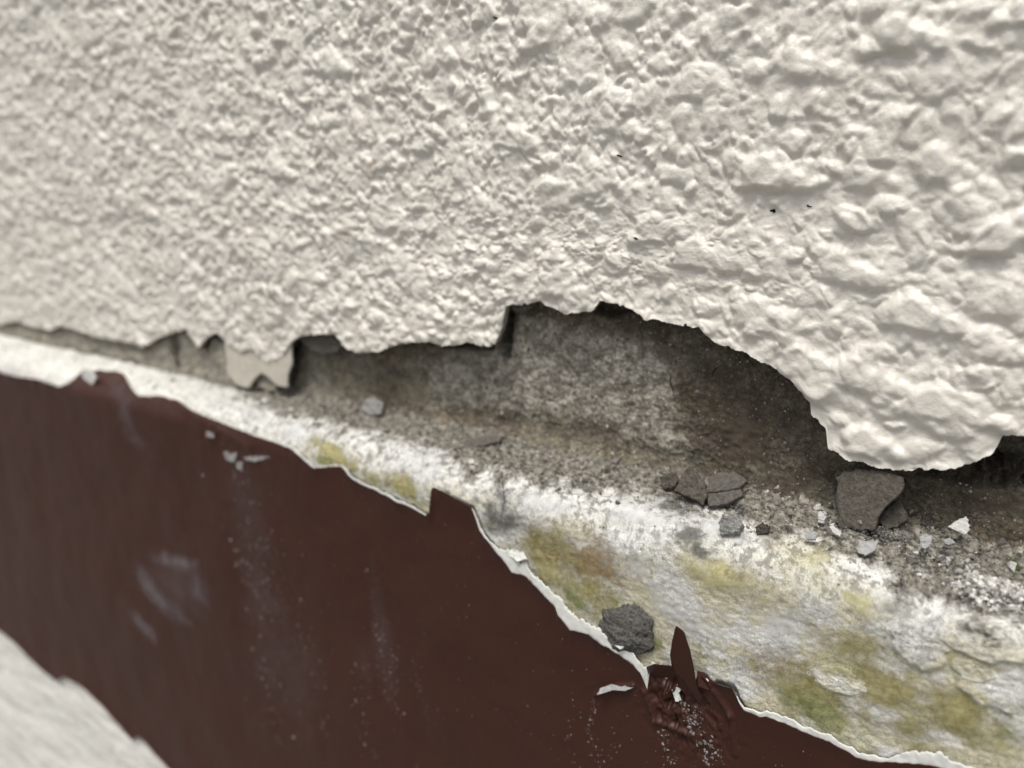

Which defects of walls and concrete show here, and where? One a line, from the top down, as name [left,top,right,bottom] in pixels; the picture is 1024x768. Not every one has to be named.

leakage [284,423,438,501]
leakage [486,490,515,531]
peeling [0,301,1024,768]
leakage [526,529,617,614]
leakage [612,496,756,590]
leakage [959,455,1017,515]
leakage [680,702,725,767]
leakage [769,660,846,731]
leakage [829,637,988,737]